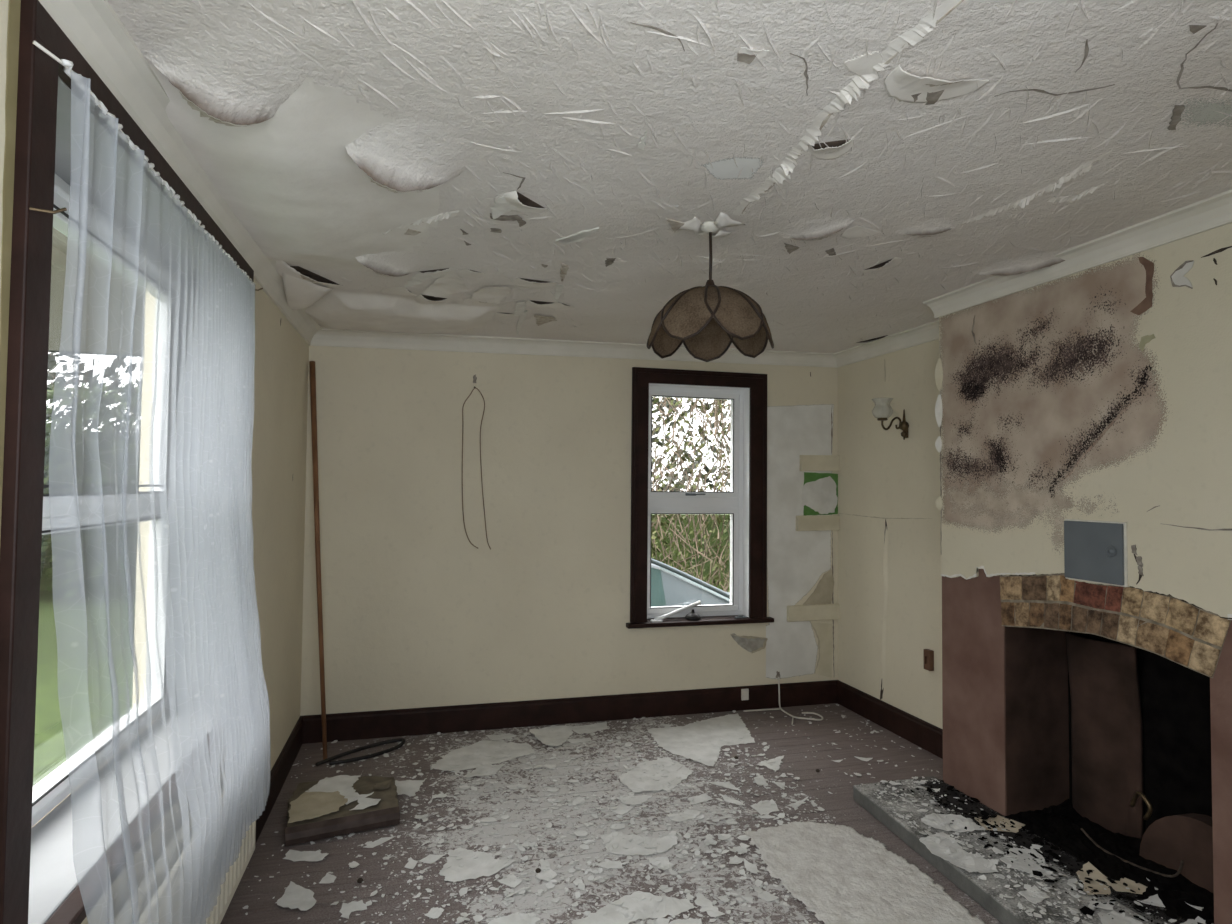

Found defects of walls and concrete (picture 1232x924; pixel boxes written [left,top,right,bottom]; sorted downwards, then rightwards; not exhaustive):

crack [790,53,809,96]
peeling [911,89,945,105]
crack [994,39,1115,97]
crack [1176,23,1232,92]
peeling [490,213,526,233]
damp [939,253,1169,555]
flaking render [766,404,834,679]